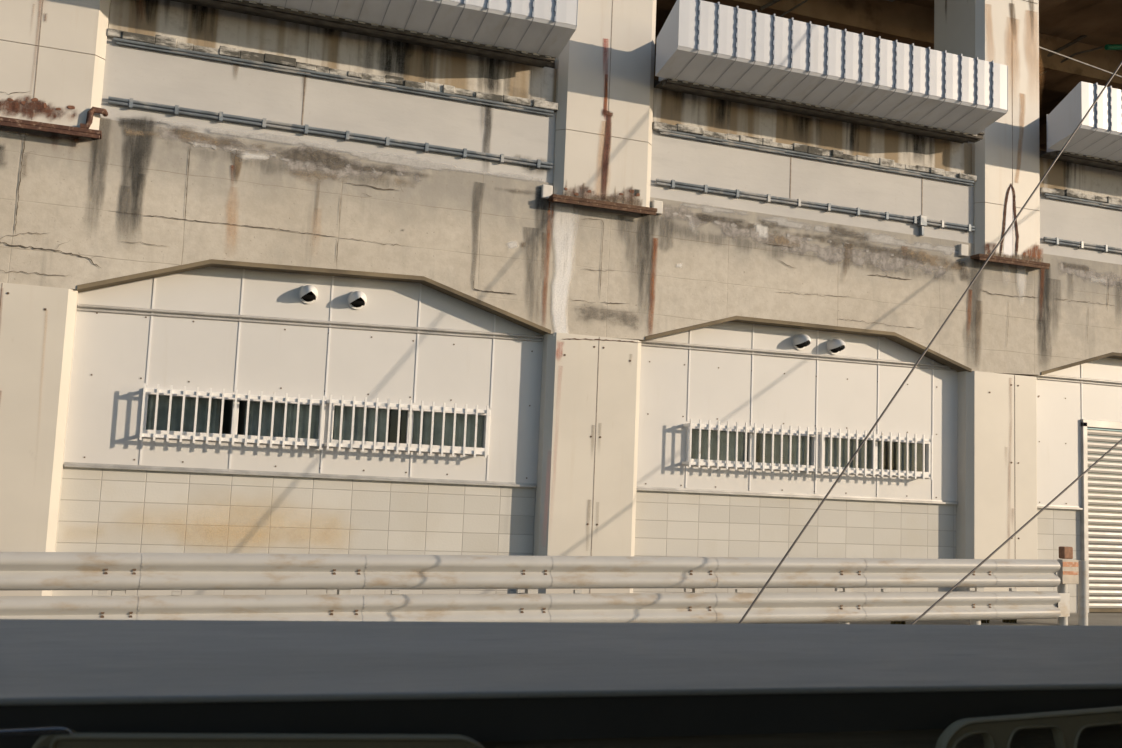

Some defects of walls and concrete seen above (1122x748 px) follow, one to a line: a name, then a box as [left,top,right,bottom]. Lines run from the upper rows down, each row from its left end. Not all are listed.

leakage [382,39,428,75]
rust [0,92,75,119]
leakage [93,117,109,201]
leakage [120,118,153,221]
crack [0,132,401,268]
rust [543,77,640,312]
leakage [913,134,924,154]